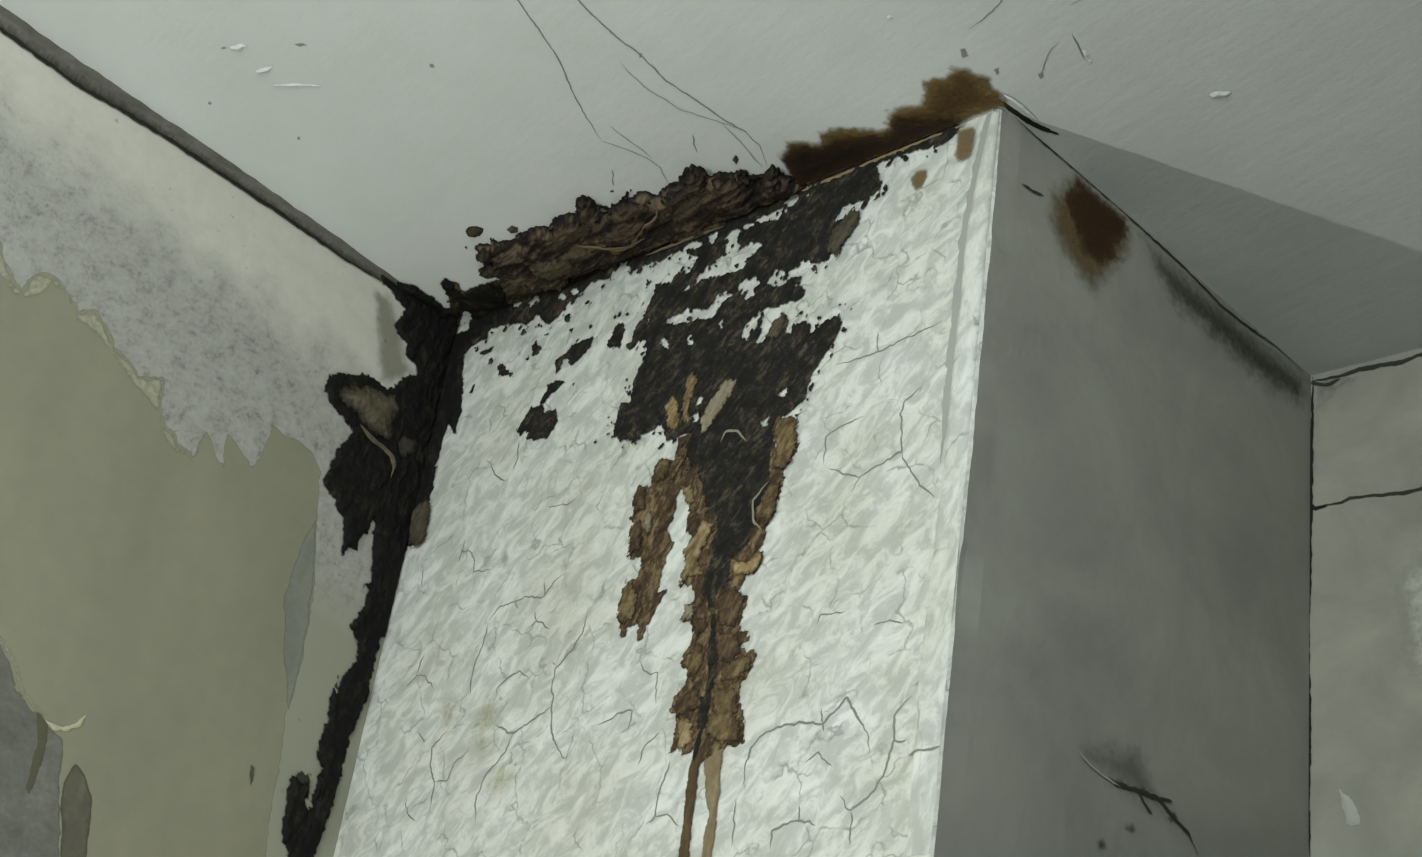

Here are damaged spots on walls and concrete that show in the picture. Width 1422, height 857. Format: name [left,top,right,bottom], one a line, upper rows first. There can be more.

crack [517,0,666,185]
peeling [465,156,806,292]
crack [578,0,767,166]
corrosion [780,70,1006,193]
peeling [0,31,417,857]
leakage [282,124,959,857]
crack [1015,117,1422,857]